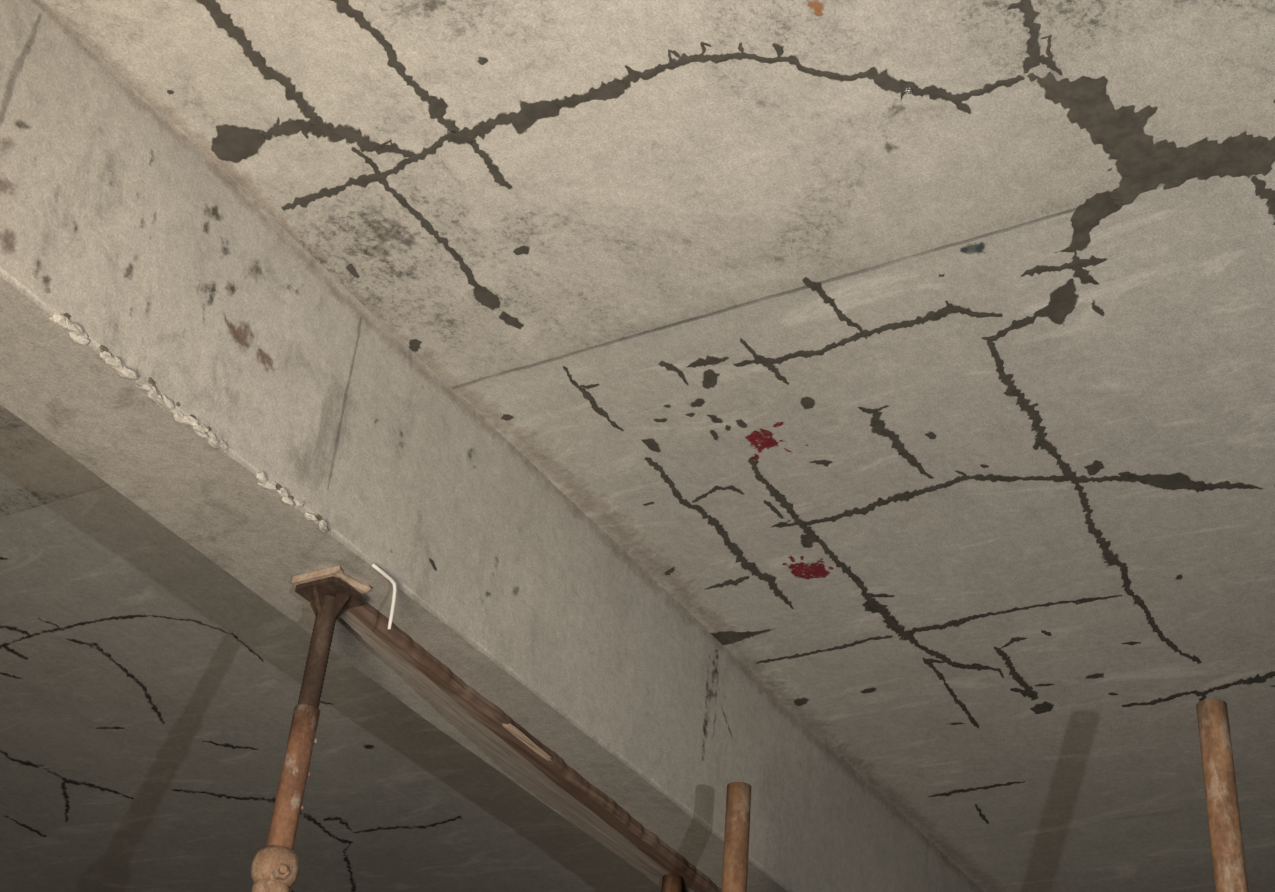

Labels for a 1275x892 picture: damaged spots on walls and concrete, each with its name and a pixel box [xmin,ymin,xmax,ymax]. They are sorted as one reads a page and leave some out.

crack [196,0,1062,329]
crack [1251,176,1275,225]
corrosion [225,318,273,367]
crack [563,249,1275,728]
crack [0,615,263,724]
crack [0,751,133,837]
crack [203,741,259,750]
crack [172,789,461,891]